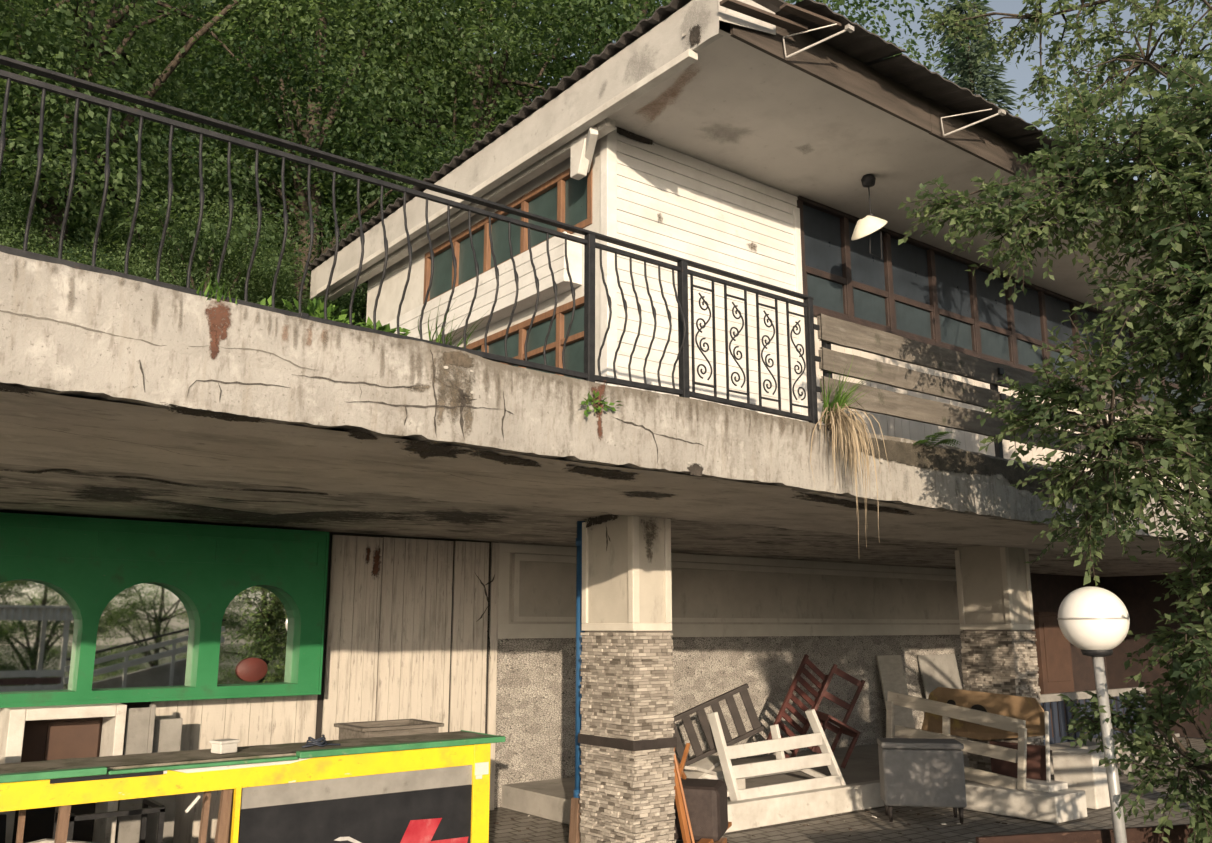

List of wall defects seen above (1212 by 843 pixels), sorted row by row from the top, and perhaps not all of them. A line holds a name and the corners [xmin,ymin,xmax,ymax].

rust [205,301,231,359]
crack [0,310,513,440]
water stain [405,351,475,430]
spalling [395,441,540,469]
spalling [564,464,638,483]
crack [611,416,704,463]
spalling [791,492,914,516]
rust [366,546,381,579]